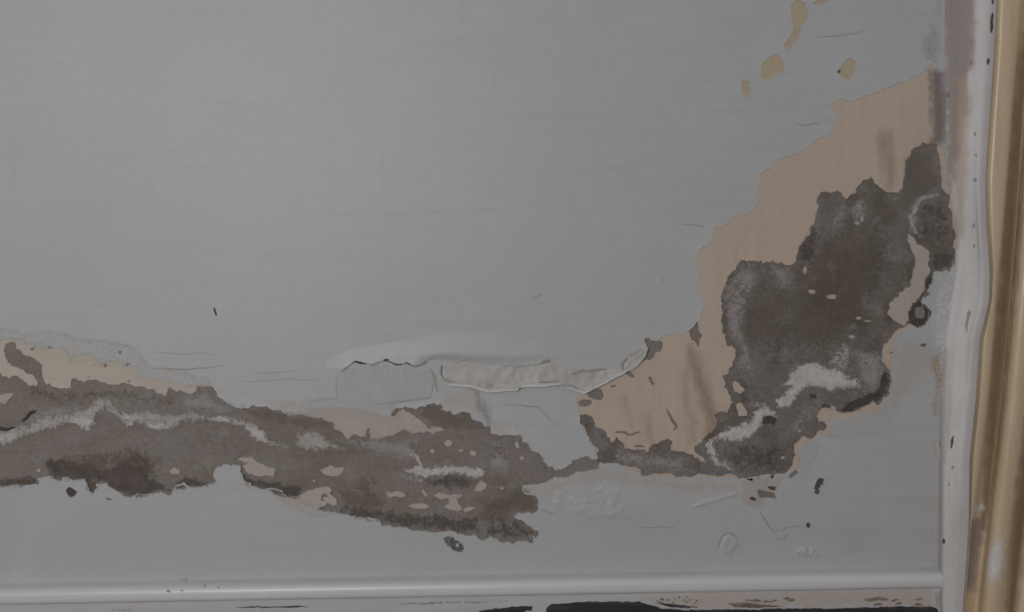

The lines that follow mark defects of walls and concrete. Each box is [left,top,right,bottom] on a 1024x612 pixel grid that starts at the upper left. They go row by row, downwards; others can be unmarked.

peeling [761,0,829,79]
flaking render [0,64,957,543]
leakage [705,200,906,470]
crack [240,359,426,401]
leakage [0,362,542,487]
leakage [45,451,207,496]
leakage [243,475,301,496]
leakage [340,480,532,537]